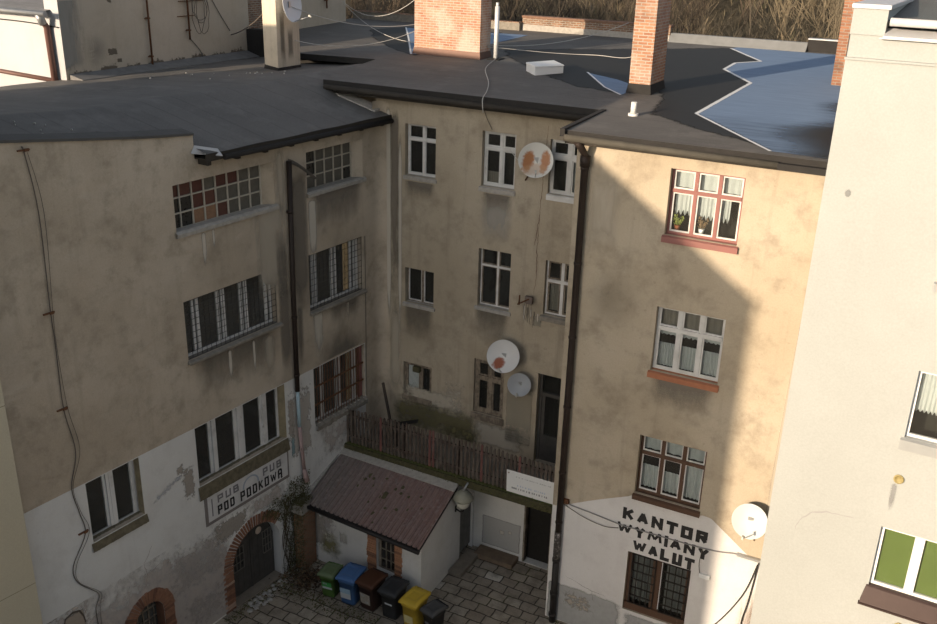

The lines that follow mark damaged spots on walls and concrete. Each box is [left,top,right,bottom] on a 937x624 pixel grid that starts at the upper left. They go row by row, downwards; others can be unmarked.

water stain [204,153,357,375]
water stain [386,109,432,380]
peeling [177,464,195,497]
water stain [397,385,521,452]
peeling [58,486,280,624]
water stain [547,581,654,624]